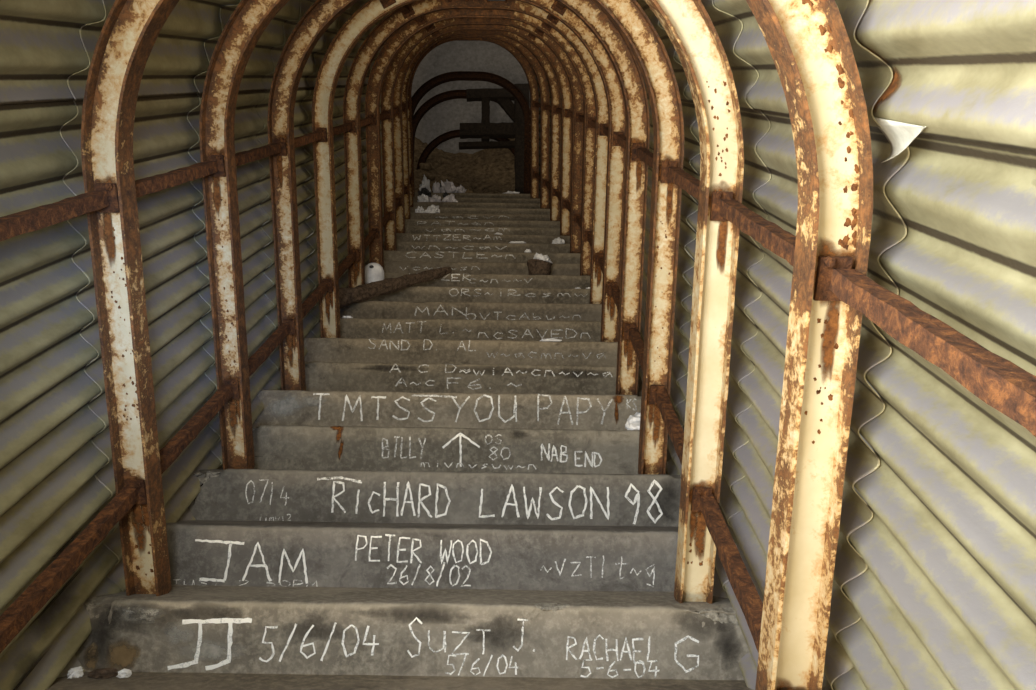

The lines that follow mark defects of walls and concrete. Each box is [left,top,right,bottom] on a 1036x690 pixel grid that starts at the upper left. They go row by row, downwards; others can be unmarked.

rust [873,70,900,113]
rust [209,150,226,214]
rust [658,157,674,224]
rust [708,184,734,209]
rust [103,212,116,263]
rust [716,221,728,271]
rust [813,240,852,290]
rust [821,301,840,378]
rust [647,383,660,445]
rust [132,504,150,552]
rust [689,481,713,557]
rust [775,681,806,690]